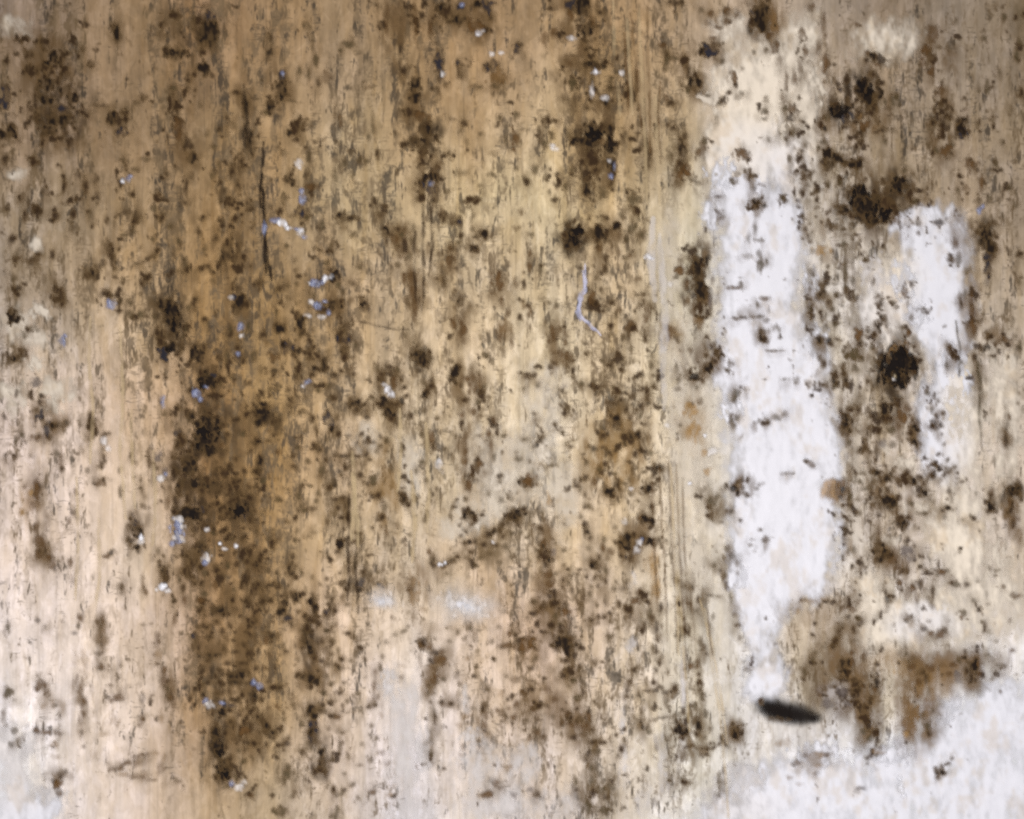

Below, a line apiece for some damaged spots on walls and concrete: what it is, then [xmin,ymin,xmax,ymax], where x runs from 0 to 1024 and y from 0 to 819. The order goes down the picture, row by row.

damp [0,21,93,147]
damp [660,37,738,103]
damp [417,152,488,253]
damp [561,206,641,271]
damp [524,82,713,202]
damp [735,149,758,180]
damp [746,197,766,211]
damp [6,251,54,332]
damp [688,336,729,383]
damp [779,52,968,602]
damp [84,10,440,798]
damp [725,476,749,497]